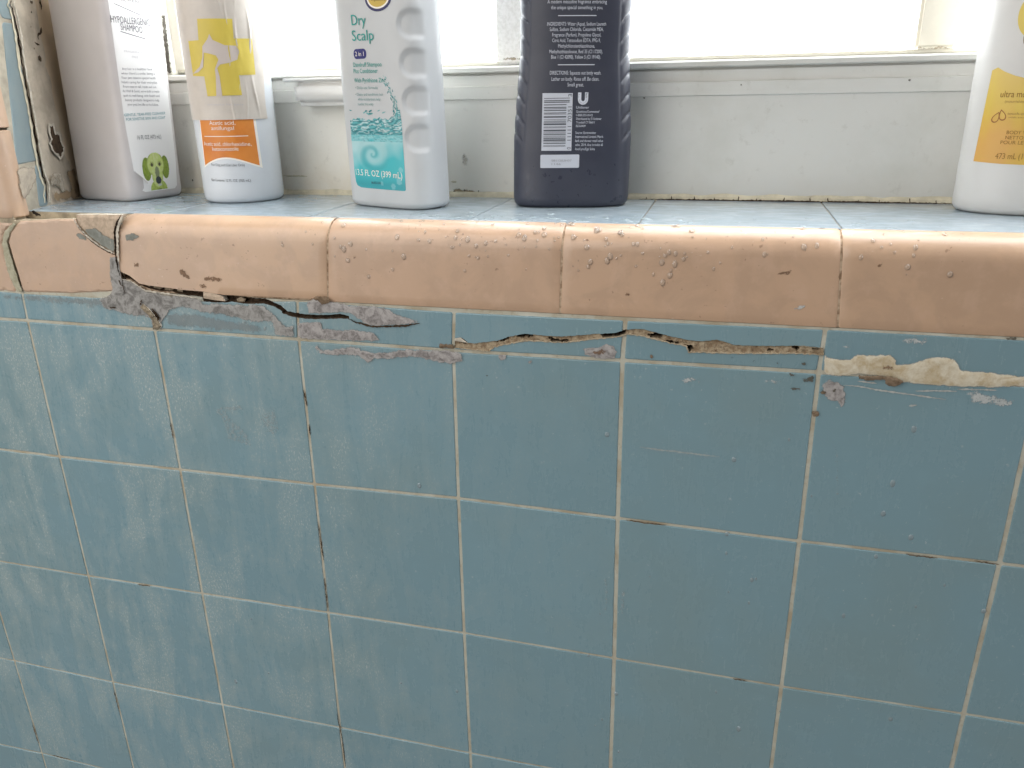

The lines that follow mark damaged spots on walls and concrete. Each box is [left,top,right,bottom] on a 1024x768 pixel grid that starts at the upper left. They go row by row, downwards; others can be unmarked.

peeling [76,228,139,251]
crack [73,214,420,328]
crack [439,329,824,356]
spalling [824,355,1024,388]